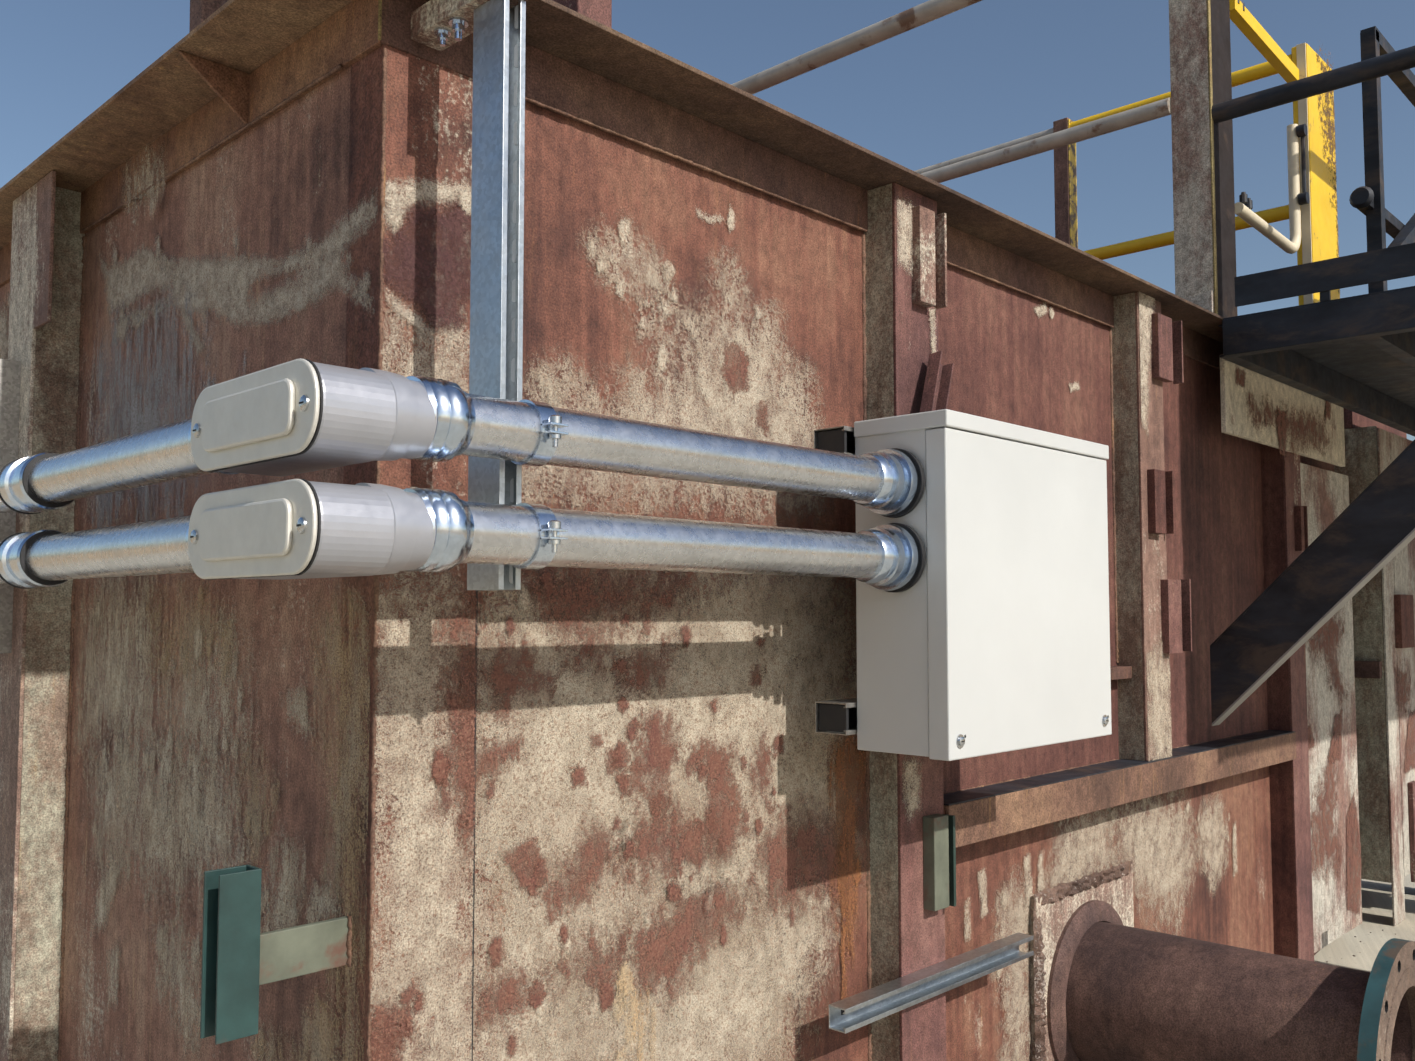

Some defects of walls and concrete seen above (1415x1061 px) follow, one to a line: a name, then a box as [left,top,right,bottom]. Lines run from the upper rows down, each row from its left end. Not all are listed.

peeling [387,209,403,233]
peeling [459,189,471,215]
peeling [897,198,914,275]
peeling [522,219,821,448]
peeling [928,308,937,353]
corrosion [1236,368,1331,456]
peeling [521,465,824,521]
corrosion [1305,613,1362,915]
corrosion [302,593,424,1061]
corrosion [431,567,867,1061]
peeling [964,789,1238,1061]